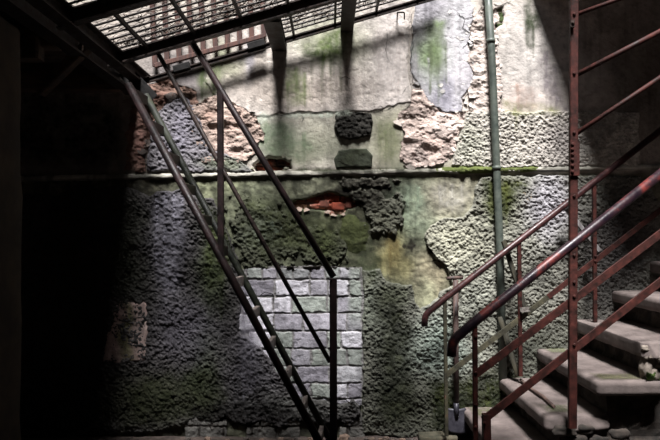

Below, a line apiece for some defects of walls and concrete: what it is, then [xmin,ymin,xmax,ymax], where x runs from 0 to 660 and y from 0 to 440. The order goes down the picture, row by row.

peeling [117,0,505,172]
spalling [293,193,357,216]